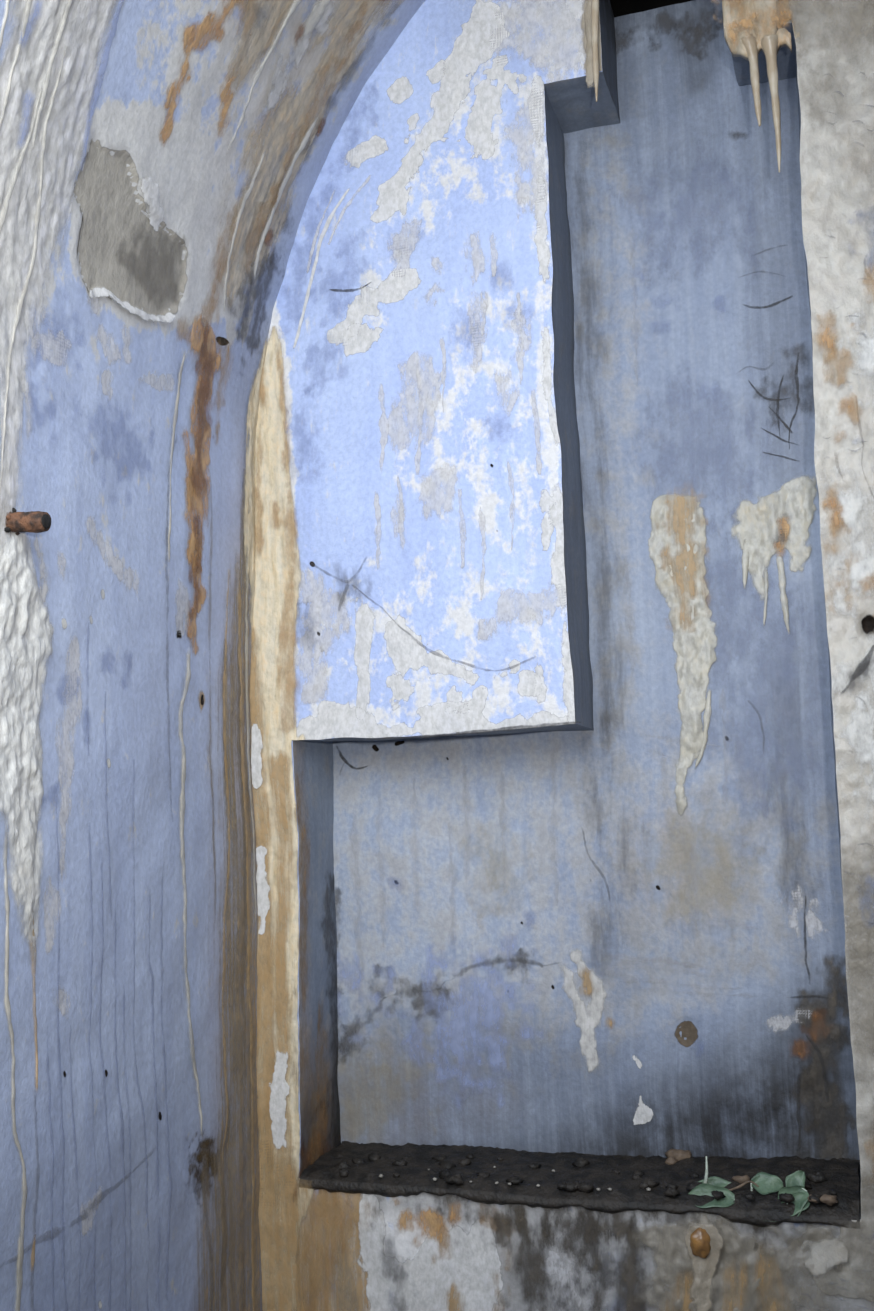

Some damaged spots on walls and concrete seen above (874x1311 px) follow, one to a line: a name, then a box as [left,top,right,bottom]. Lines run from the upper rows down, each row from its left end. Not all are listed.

leakage [581,0,631,87]
spalling [74,139,188,398]
rust [160,0,390,654]
peeling [388,353,442,449]
peeling [327,0,585,373]
peeling [495,310,560,443]
peeling [44,618,82,952]
leakage [199,493,646,1311]
peeling [295,484,575,740]
leakage [768,0,874,1311]
crack [80,1188,101,1235]